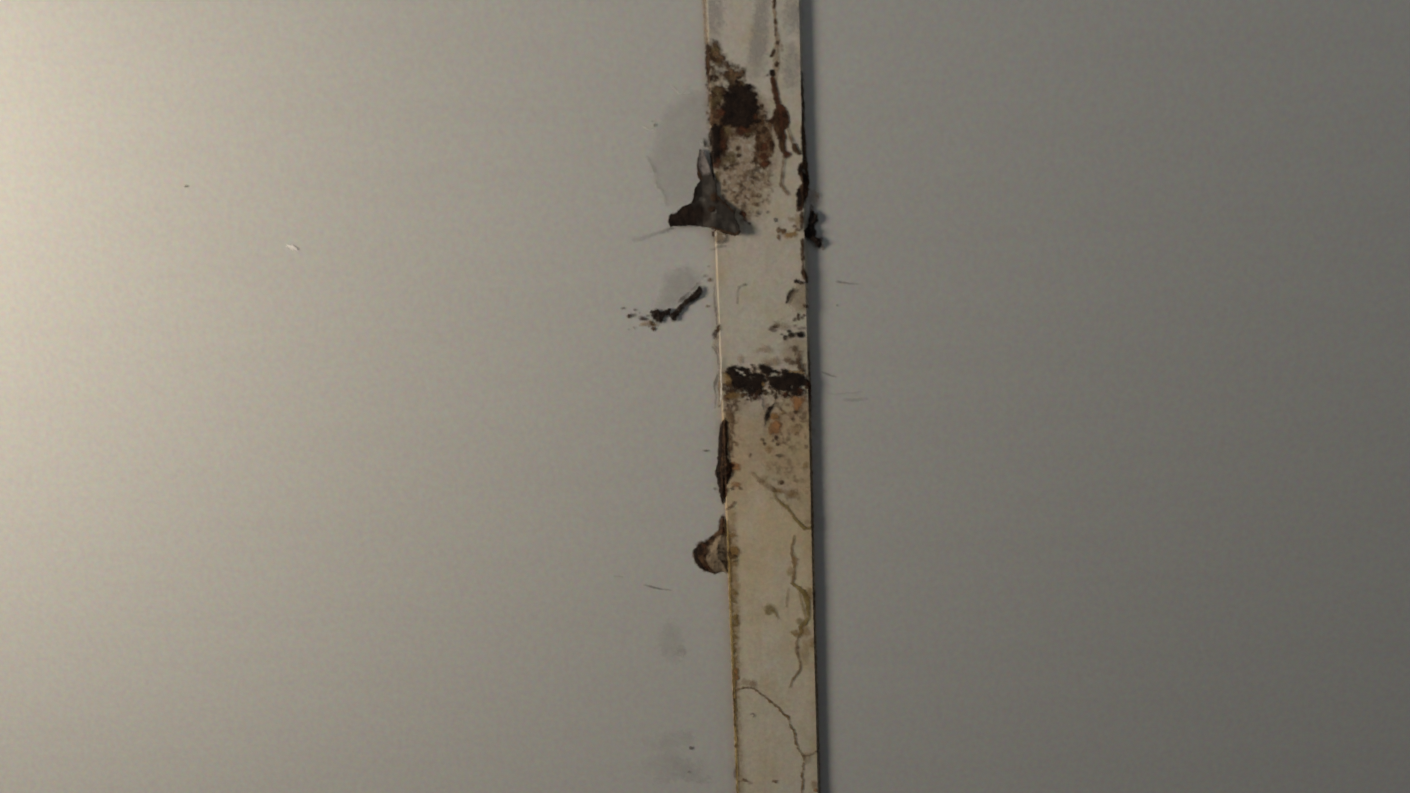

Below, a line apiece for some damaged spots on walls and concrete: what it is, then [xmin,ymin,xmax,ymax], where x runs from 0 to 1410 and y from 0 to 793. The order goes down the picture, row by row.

peeling [668,149,741,242]
crack [736,473,817,793]